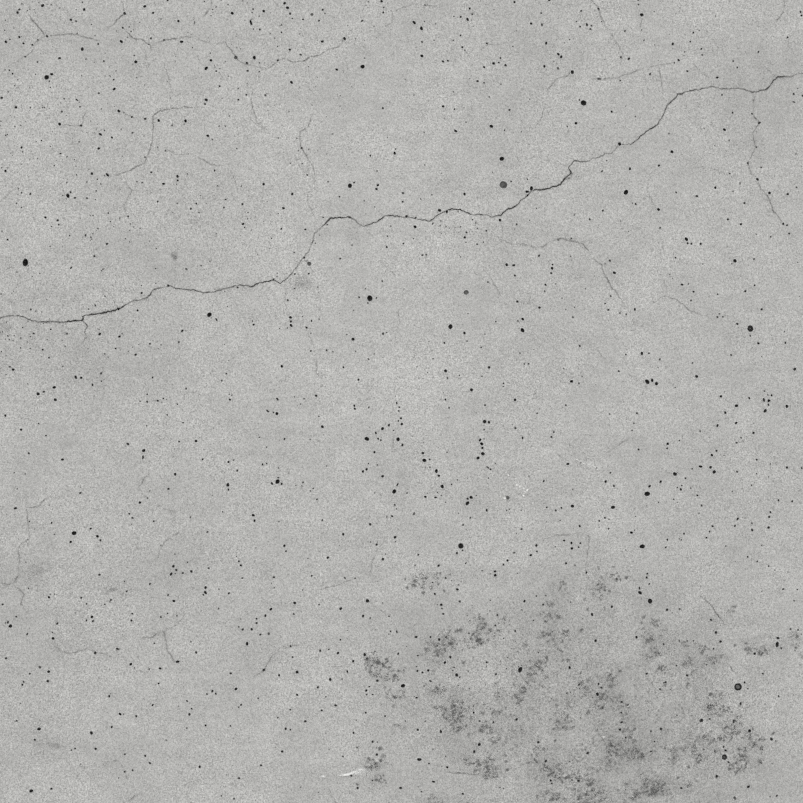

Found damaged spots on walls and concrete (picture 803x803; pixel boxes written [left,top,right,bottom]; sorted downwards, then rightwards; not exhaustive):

crack [1,73,803,342]